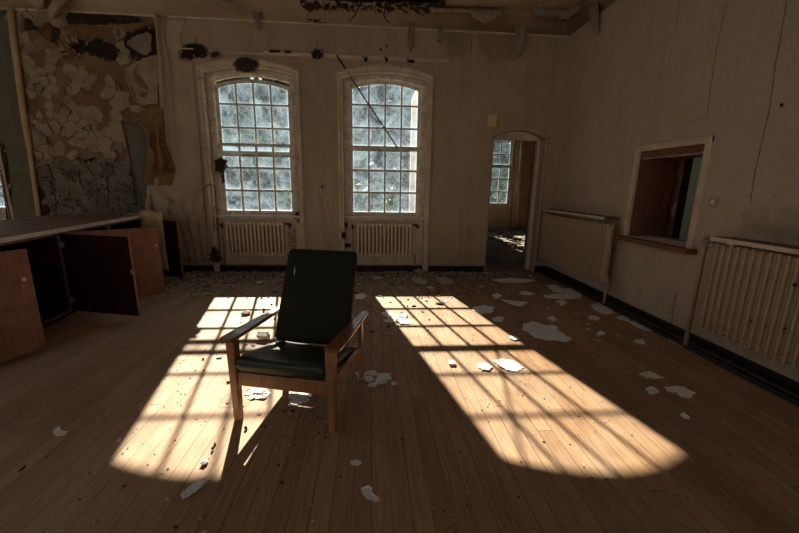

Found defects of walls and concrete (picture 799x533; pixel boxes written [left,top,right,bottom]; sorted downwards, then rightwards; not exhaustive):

spalling [178,42,221,61]
spalling [232,57,259,73]
spalling [300,0,446,63]
peeling [17,0,160,216]
crack [750,1,787,203]
crack [36,150,143,215]